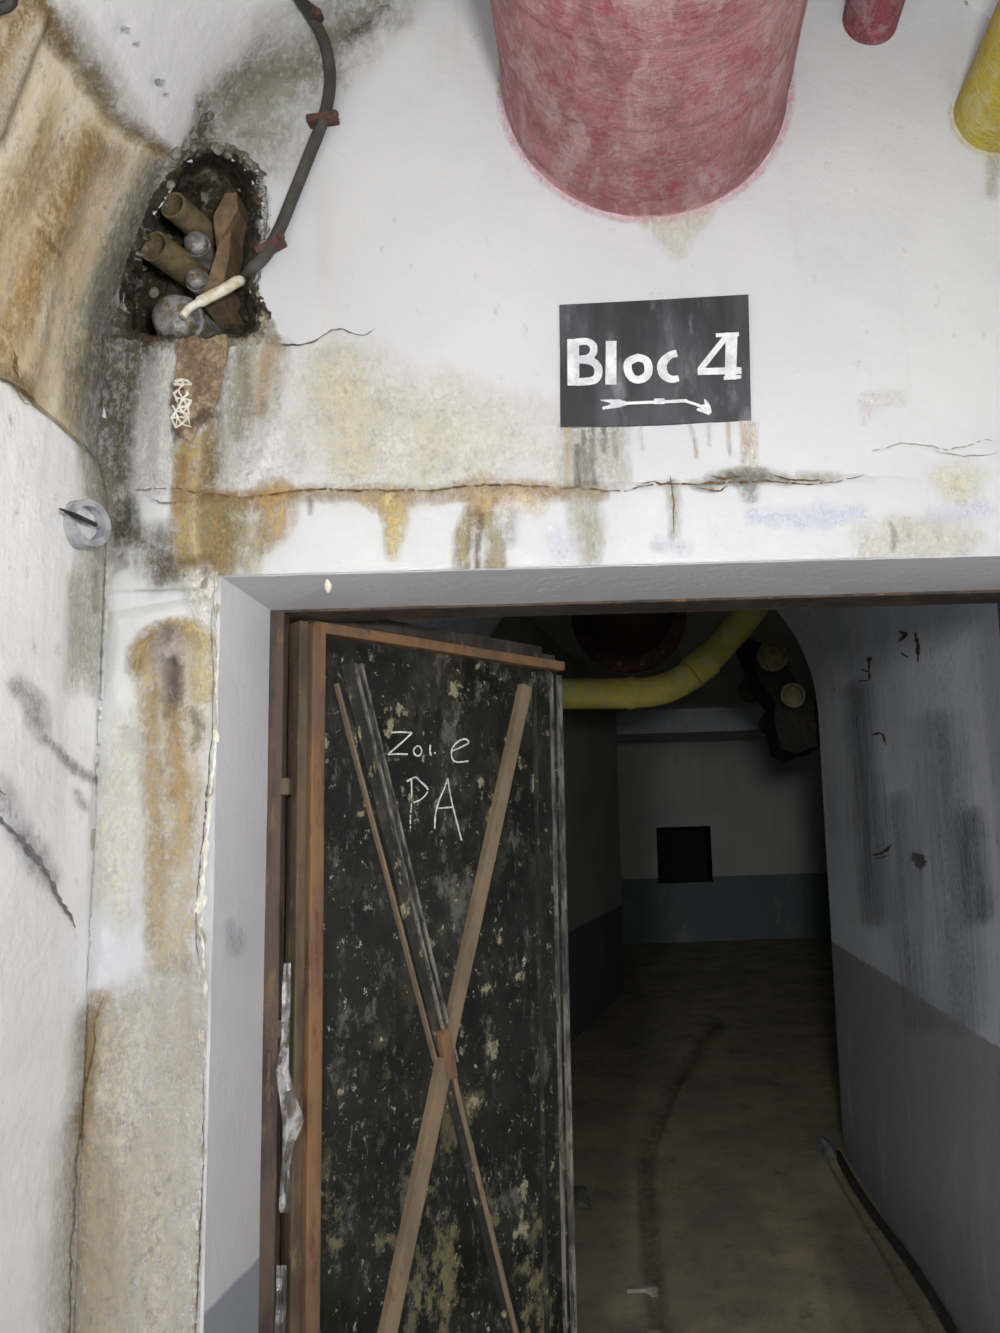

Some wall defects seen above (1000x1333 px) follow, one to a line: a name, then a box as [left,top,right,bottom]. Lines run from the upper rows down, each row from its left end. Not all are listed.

spalling [99,105,280,442]
damp [72,0,390,689]
crack [281,328,374,346]
corrosion [172,420,604,580]
crack [0,351,994,529]
crack [0,549,107,1333]
crack [194,1074,205,1333]